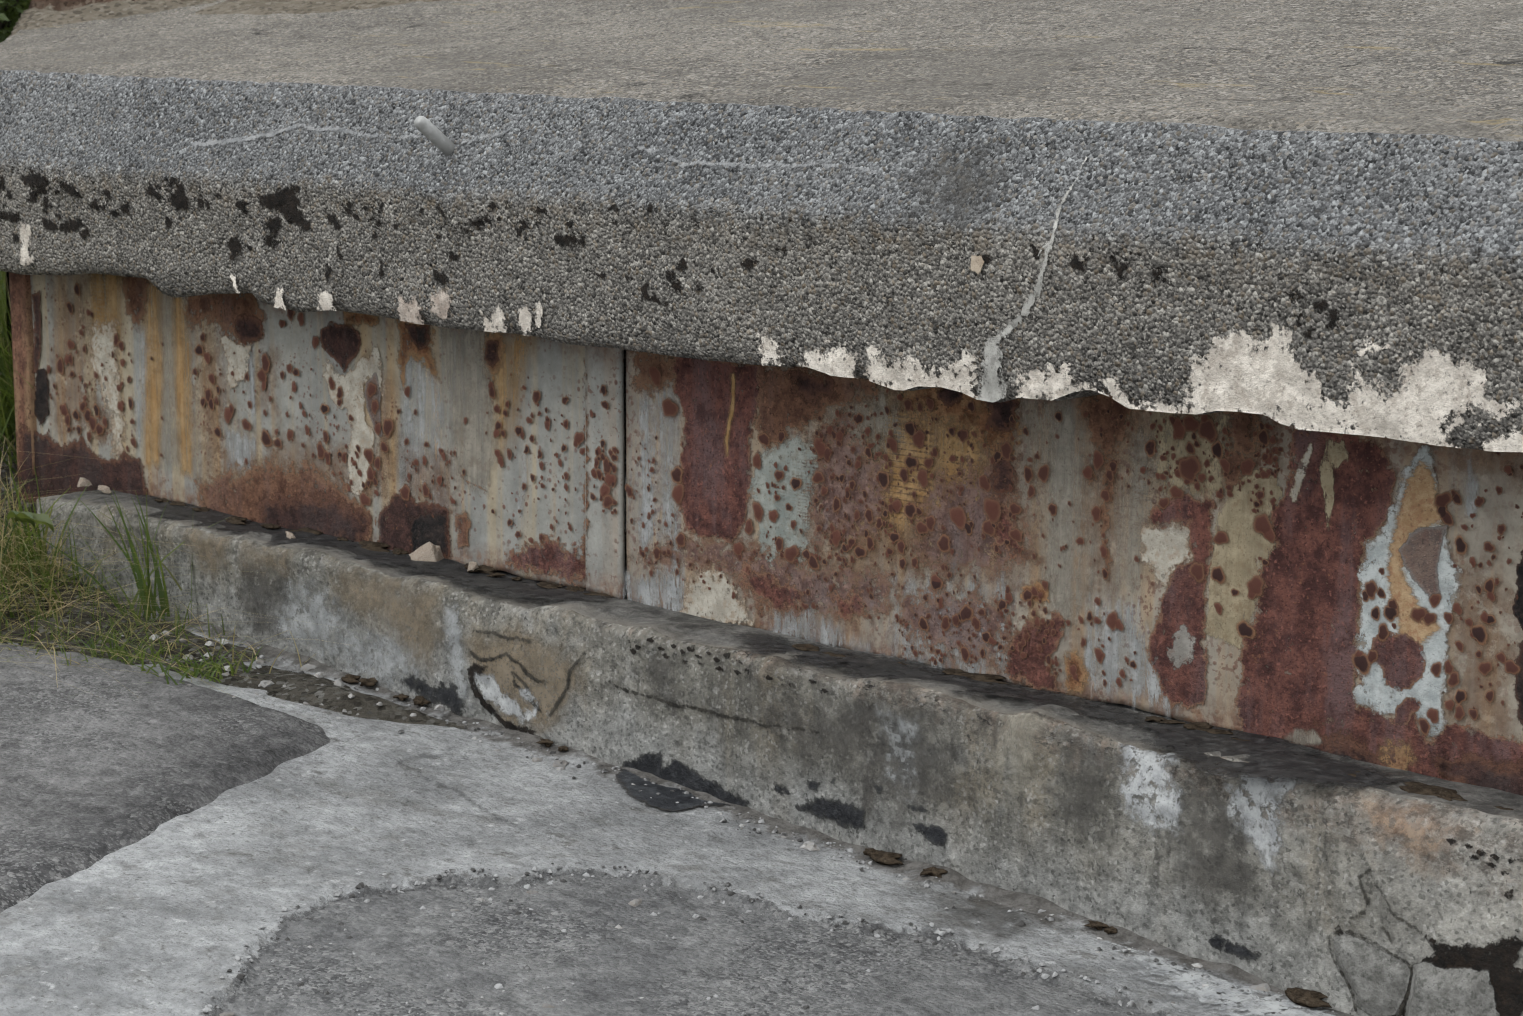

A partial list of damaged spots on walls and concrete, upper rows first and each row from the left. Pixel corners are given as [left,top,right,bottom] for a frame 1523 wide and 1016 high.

rust [16,274,150,504]
rust [182,293,471,558]
damp [756,327,979,399]
damp [1013,323,1523,452]
rust [479,331,1523,796]
peeling [1352,444,1463,742]
crack [1328,869,1420,1016]
spalling [1334,929,1523,1016]